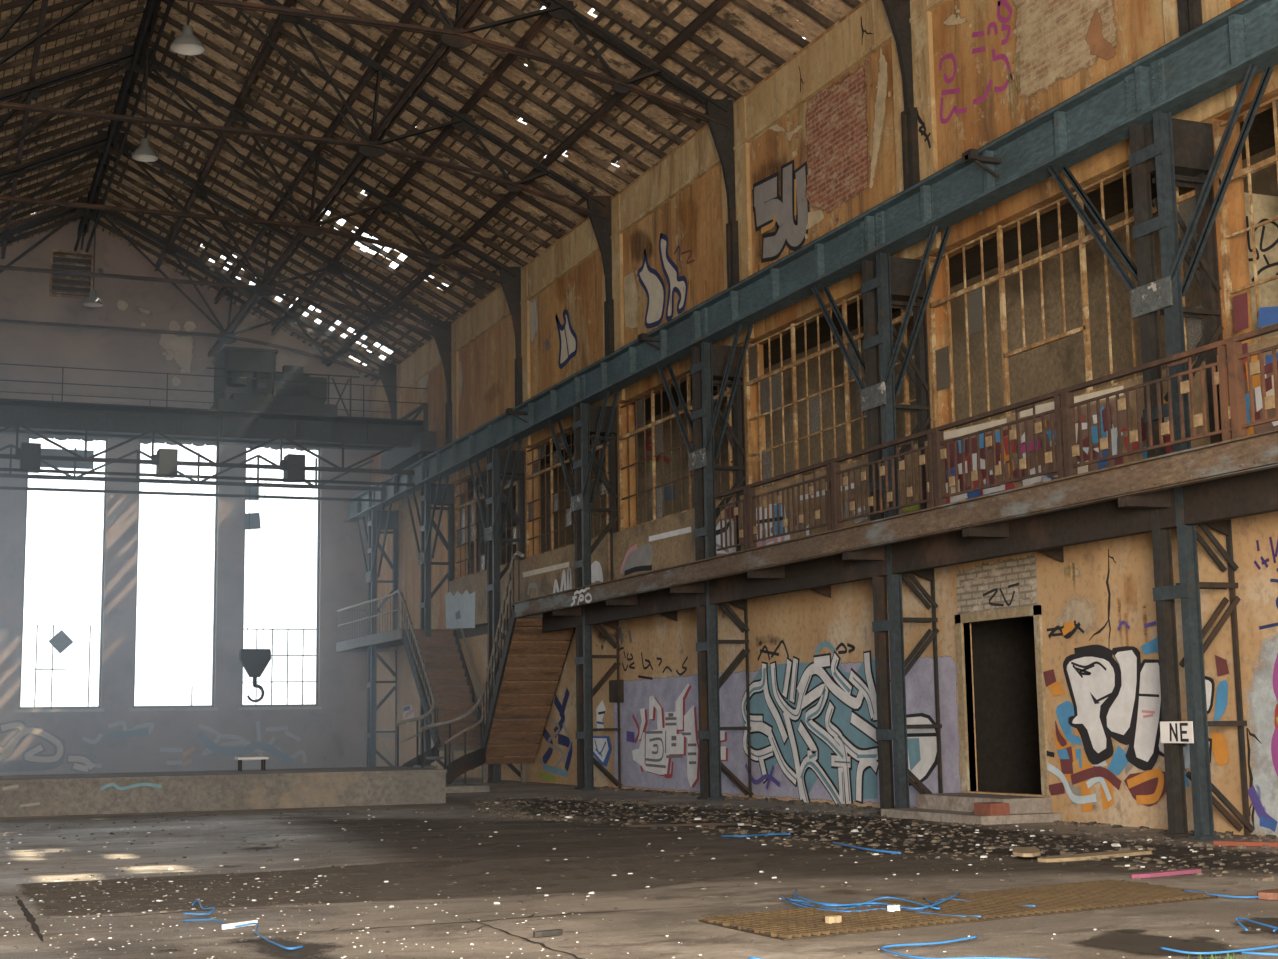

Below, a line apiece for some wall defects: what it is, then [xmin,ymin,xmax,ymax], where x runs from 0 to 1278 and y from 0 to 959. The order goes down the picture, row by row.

peeling [867,48,891,188]
spalling [1006,0,1117,98]